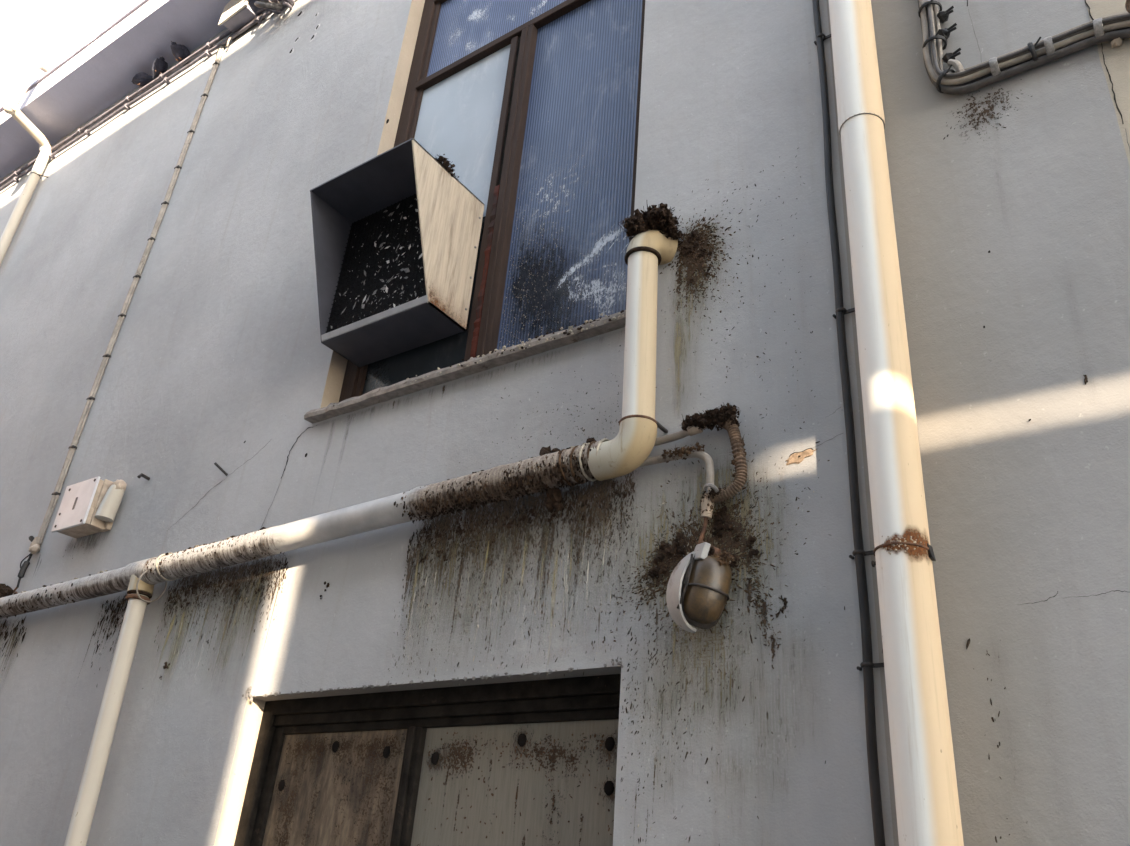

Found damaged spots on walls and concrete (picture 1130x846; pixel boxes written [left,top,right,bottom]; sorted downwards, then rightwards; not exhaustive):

crack [1084,0,1130,151]
water stain [0,617,27,674]
water stain [154,552,288,691]
water stain [388,426,819,842]
crack [1021,590,1127,605]